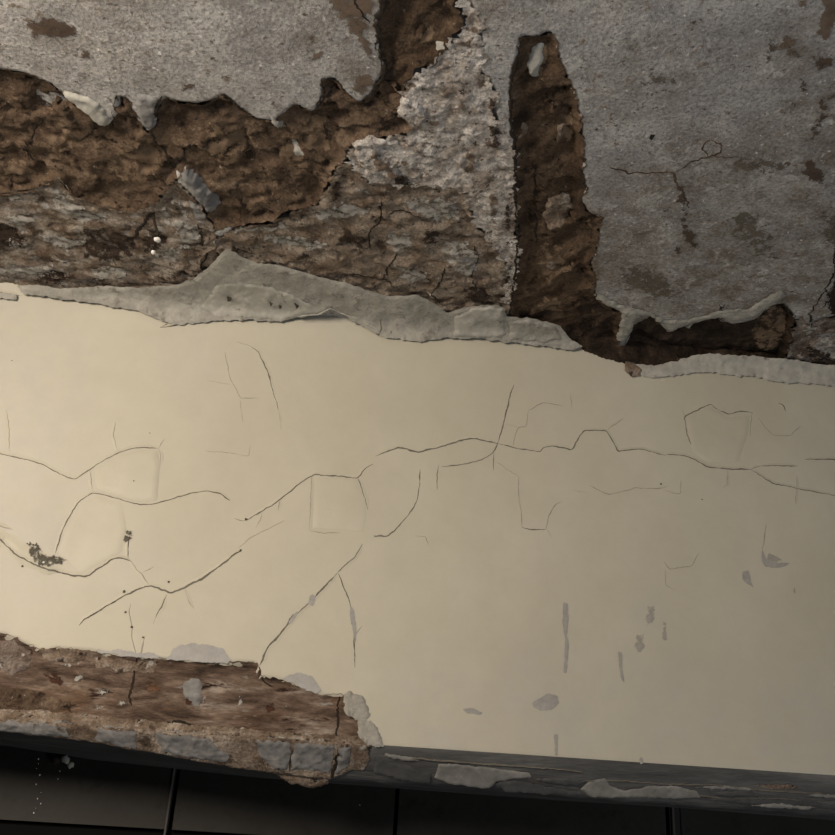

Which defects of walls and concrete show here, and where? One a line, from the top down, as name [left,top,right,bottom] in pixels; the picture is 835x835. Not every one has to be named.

spalling [0,0,835,388]
crack [609,140,736,208]
crack [206,342,283,431]
crack [0,385,835,665]
spalling [0,633,753,799]
peeling [751,794,835,810]